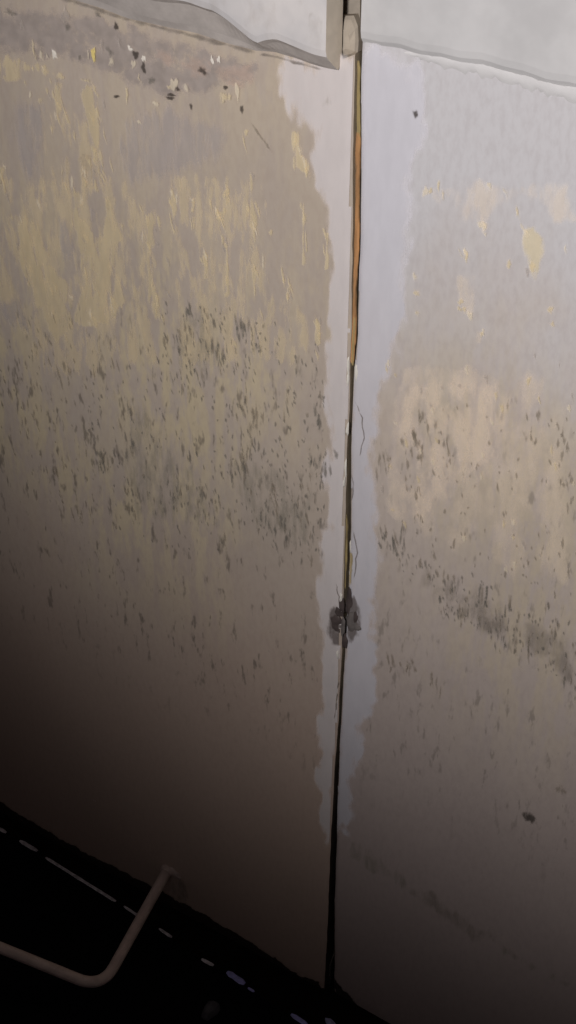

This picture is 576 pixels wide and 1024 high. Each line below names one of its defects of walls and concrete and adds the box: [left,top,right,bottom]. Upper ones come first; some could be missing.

spalling [0,12,257,113]
spalling [329,587,361,649]